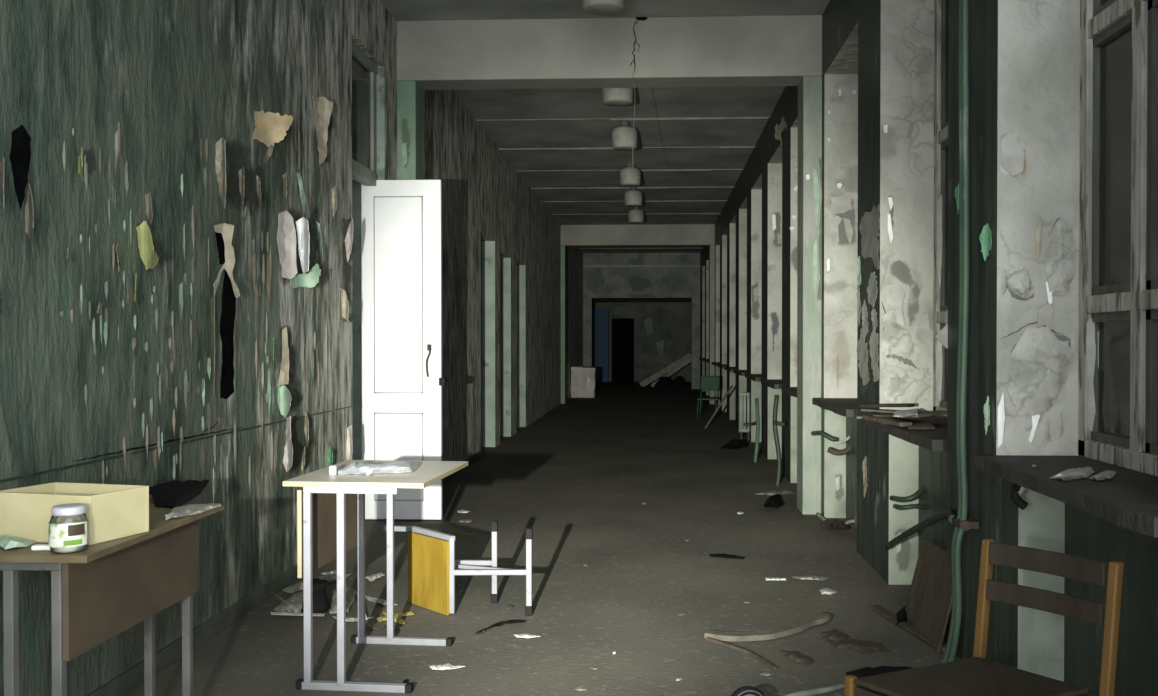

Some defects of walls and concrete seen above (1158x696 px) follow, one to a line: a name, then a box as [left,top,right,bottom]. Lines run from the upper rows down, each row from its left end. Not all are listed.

peeling [312,96,336,165]
peeling [60,121,167,373]
peeling [133,110,327,502]
peeling [331,186,354,321]
peeling [794,160,948,401]
peeling [937,184,959,288]
peeling [328,425,353,466]